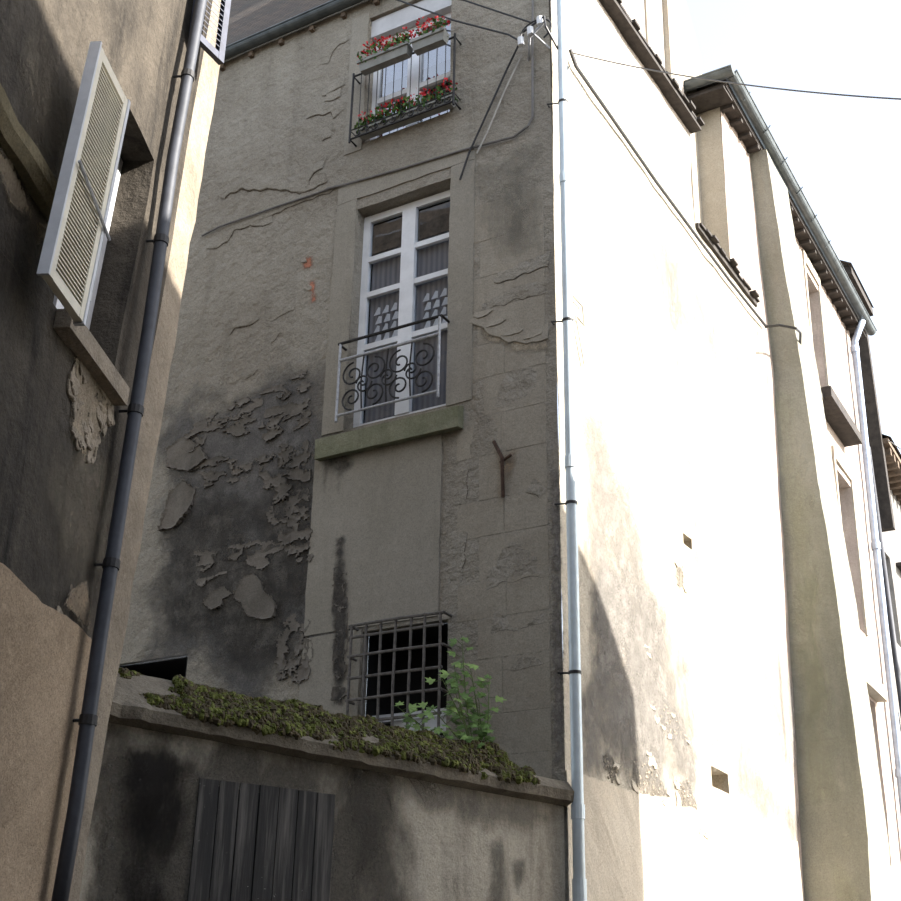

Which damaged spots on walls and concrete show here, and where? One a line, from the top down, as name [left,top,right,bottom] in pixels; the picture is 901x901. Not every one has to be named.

crack [206,31,348,249]
crack [481,250,551,310]
spalling [66,356,115,464]
flaking render [157,370,313,684]
damp [143,375,350,698]
flaking render [674,560,689,594]
damp [89,726,405,901]
flaking render [603,751,708,840]